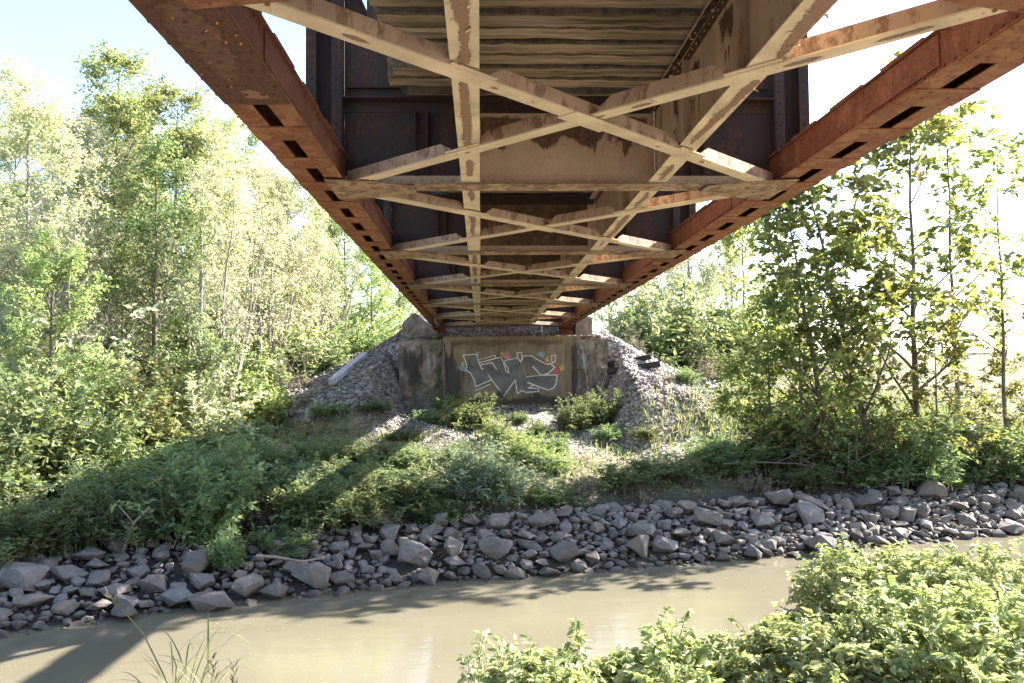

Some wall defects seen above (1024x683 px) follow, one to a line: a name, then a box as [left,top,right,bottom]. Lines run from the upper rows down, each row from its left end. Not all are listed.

peeling [446,0,473,64]
rust [719,5,733,61]
peeling [776,0,837,67]
peeling [876,25,939,43]
peeling [458,81,477,177]